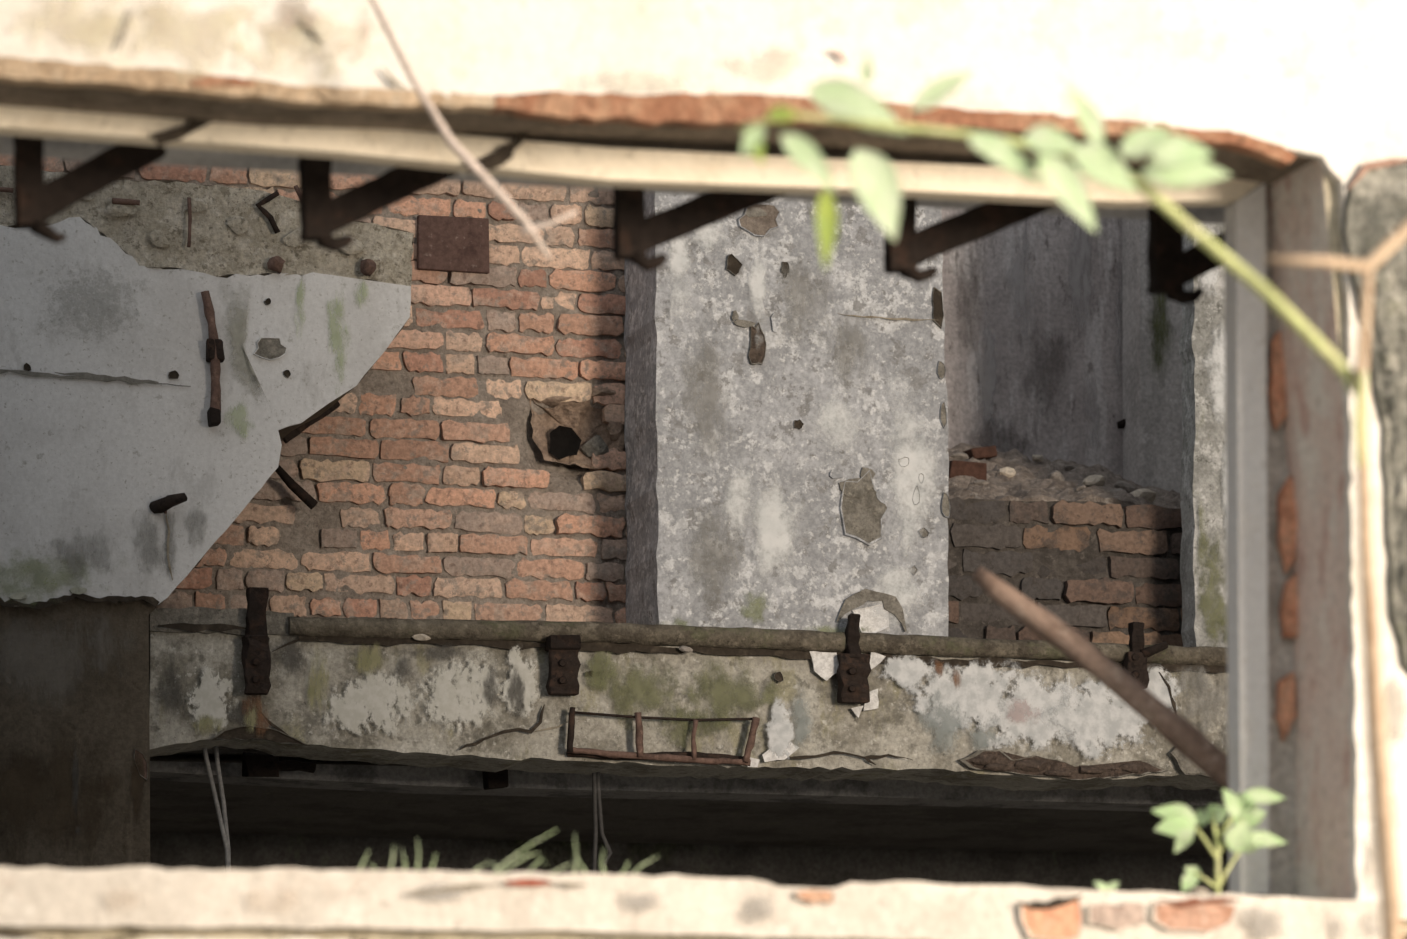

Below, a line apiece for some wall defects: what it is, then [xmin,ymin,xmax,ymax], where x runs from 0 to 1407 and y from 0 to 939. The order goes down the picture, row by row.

spalling [0,166,14,227]
spalling [46,180,414,286]
flaking render [228,303,287,393]
spalling [932,287,944,329]
spalling [550,425,582,460]
peeling [724,470,803,575]
peeling [829,397,950,633]
flaking render [1277,475,1299,638]
peeling [809,651,839,681]
spalling [566,699,799,767]
peeling [851,652,1210,781]
spalling [1016,894,1243,939]